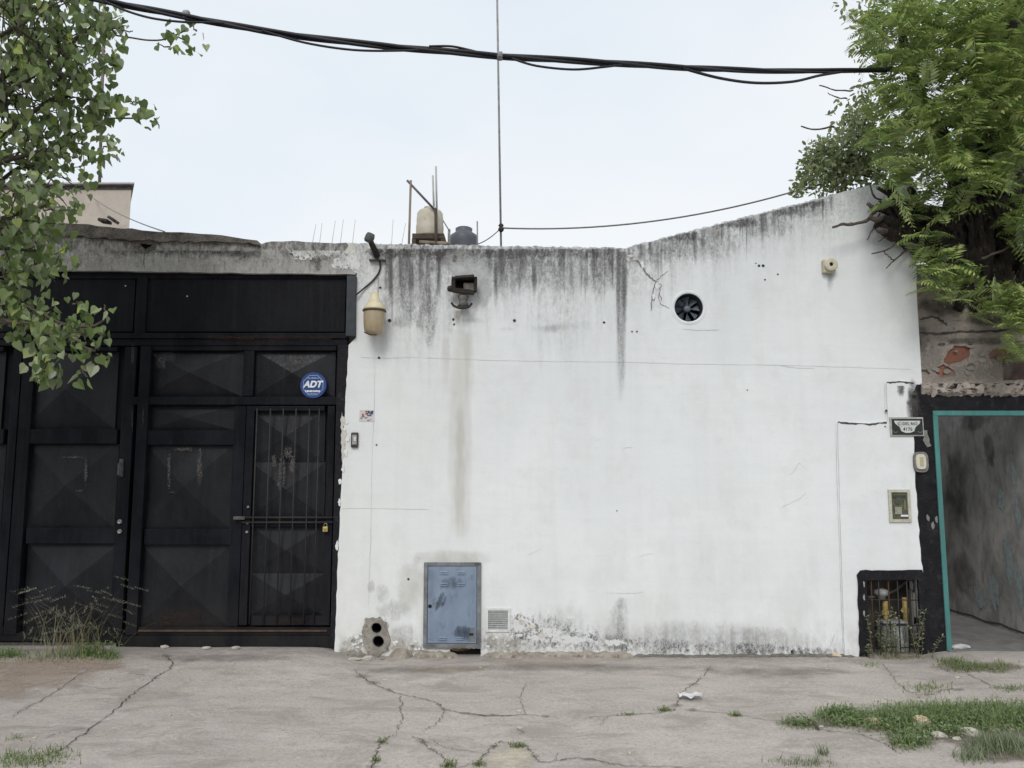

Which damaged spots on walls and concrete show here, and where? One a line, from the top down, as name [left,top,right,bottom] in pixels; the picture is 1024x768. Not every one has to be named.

damp [709,200,824,246]
damp [371,248,545,311]
damp [560,248,626,314]
crack [627,248,669,311]
flaking render [936,343,975,378]